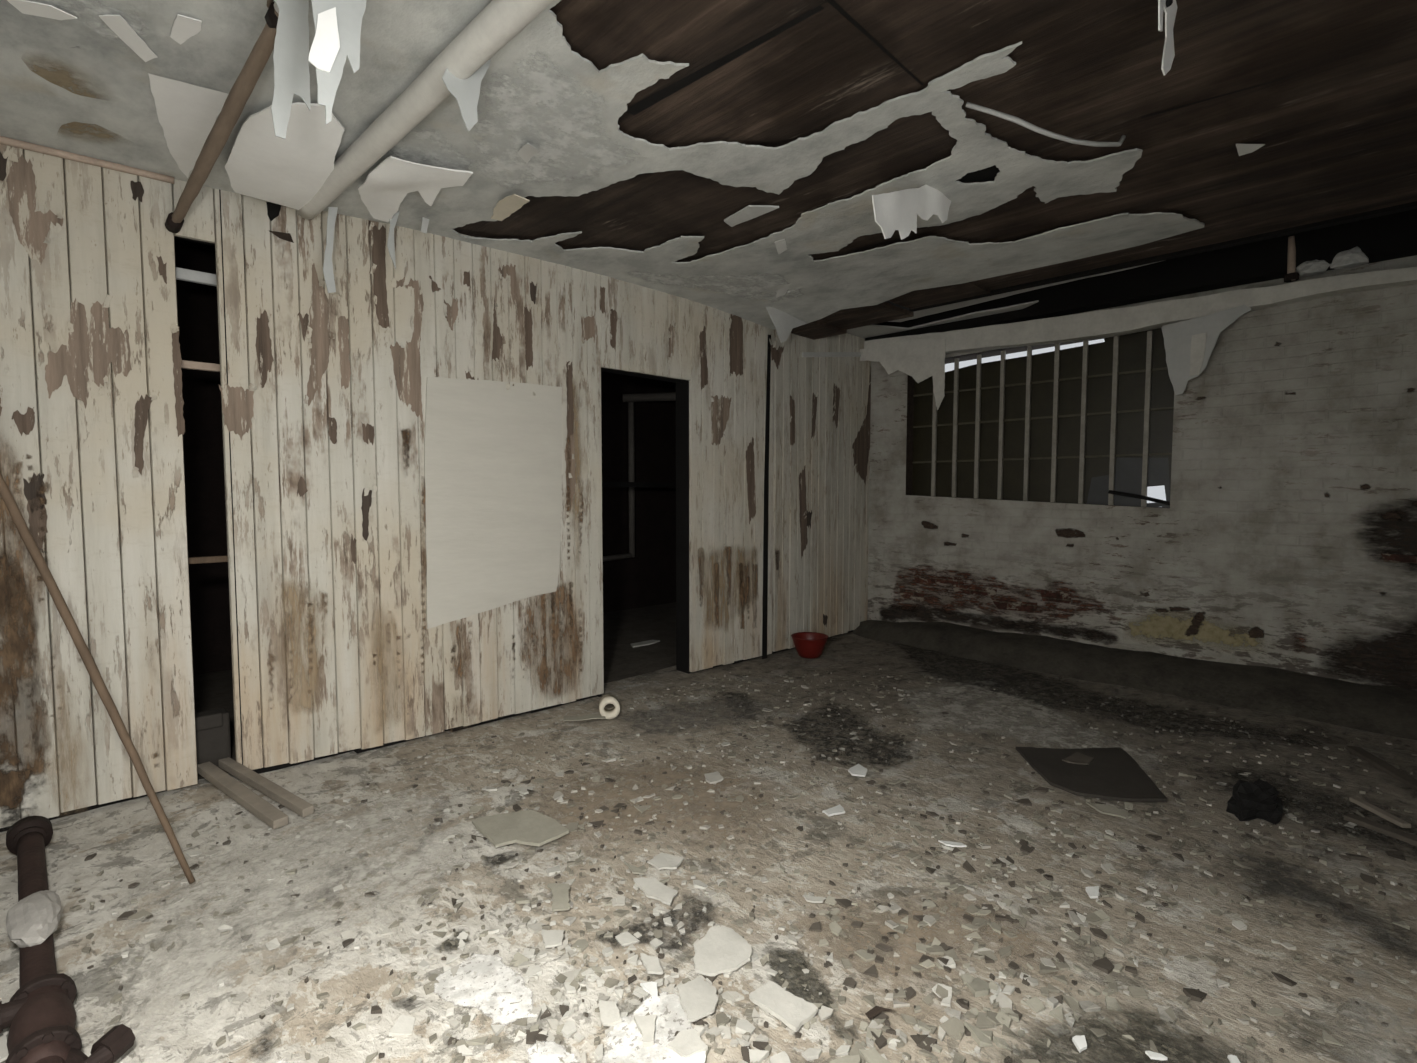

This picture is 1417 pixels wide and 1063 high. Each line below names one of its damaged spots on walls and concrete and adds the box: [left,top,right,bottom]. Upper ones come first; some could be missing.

peeling [271,0,366,139]
peeling [358,0,1417,424]
peeling [790,383,840,445]
peeling [852,338,946,485]
leakage [1362,501,1417,570]
leakage [0,552,76,825]